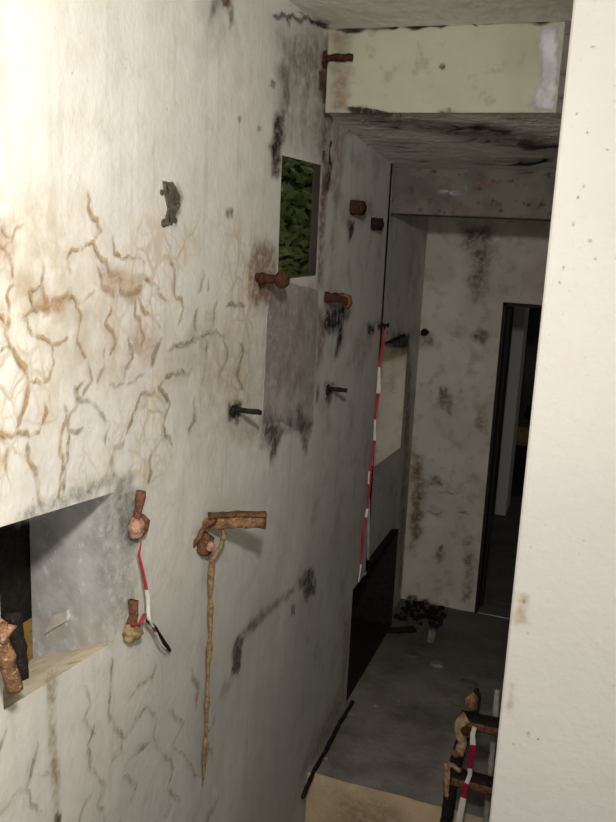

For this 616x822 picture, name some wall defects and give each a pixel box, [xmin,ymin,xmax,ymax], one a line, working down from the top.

leakage [270,116,283,174]
spalling [160,181,182,227]
crack [0,197,244,503]
leakage [319,304,345,355]
crack [27,758,49,807]
crack [86,713,103,809]